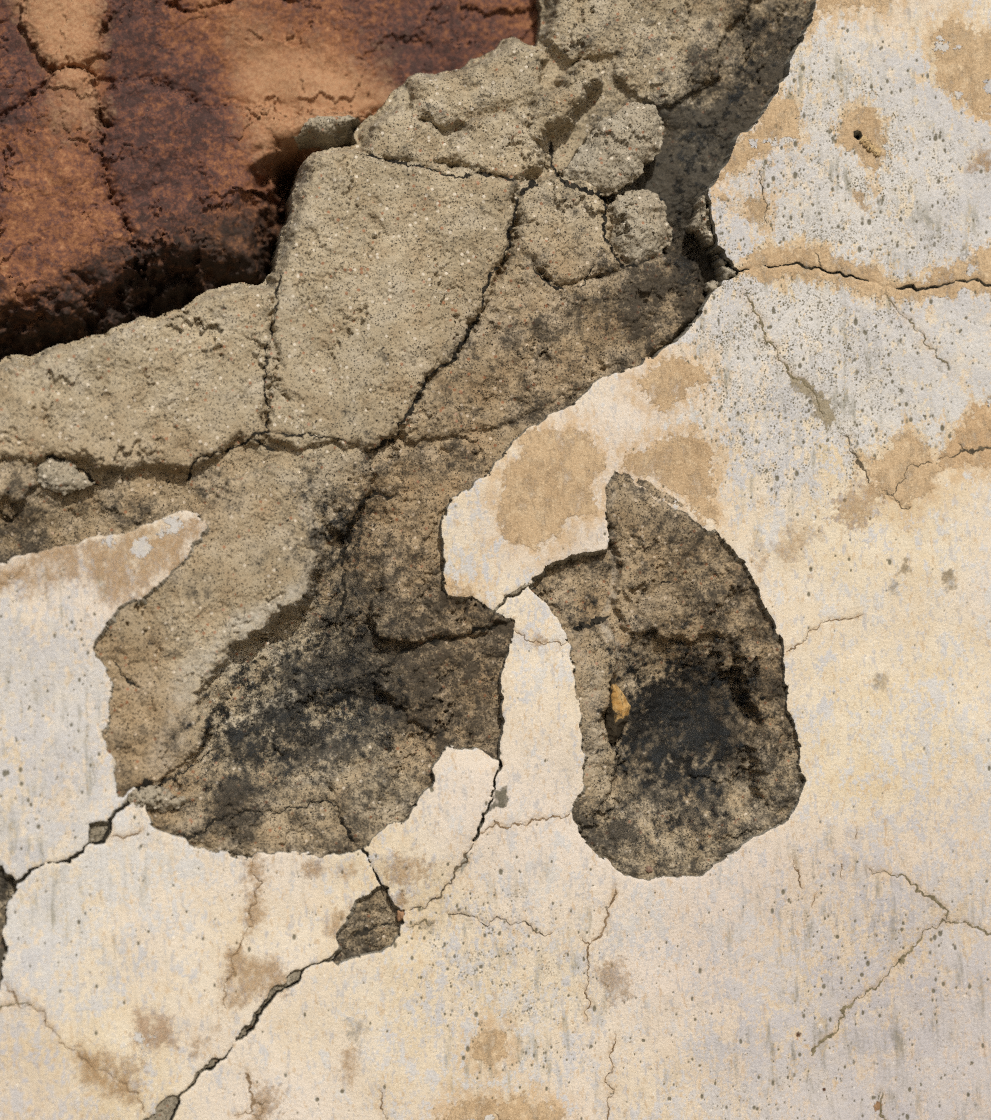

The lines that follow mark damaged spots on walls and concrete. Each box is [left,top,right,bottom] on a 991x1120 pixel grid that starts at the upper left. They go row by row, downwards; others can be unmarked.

peeling [716,94,801,201]
crack [186,141,650,481]
leakage [303,490,371,571]
crack [0,987,220,1120]
crack [13,750,212,885]
spalling [94,467,515,858]
leakage [184,584,429,824]
spalling [333,877,403,963]
crack [240,813,570,1038]
spalling [497,426,804,880]
leakage [596,636,776,844]
crack [812,864,991,1055]